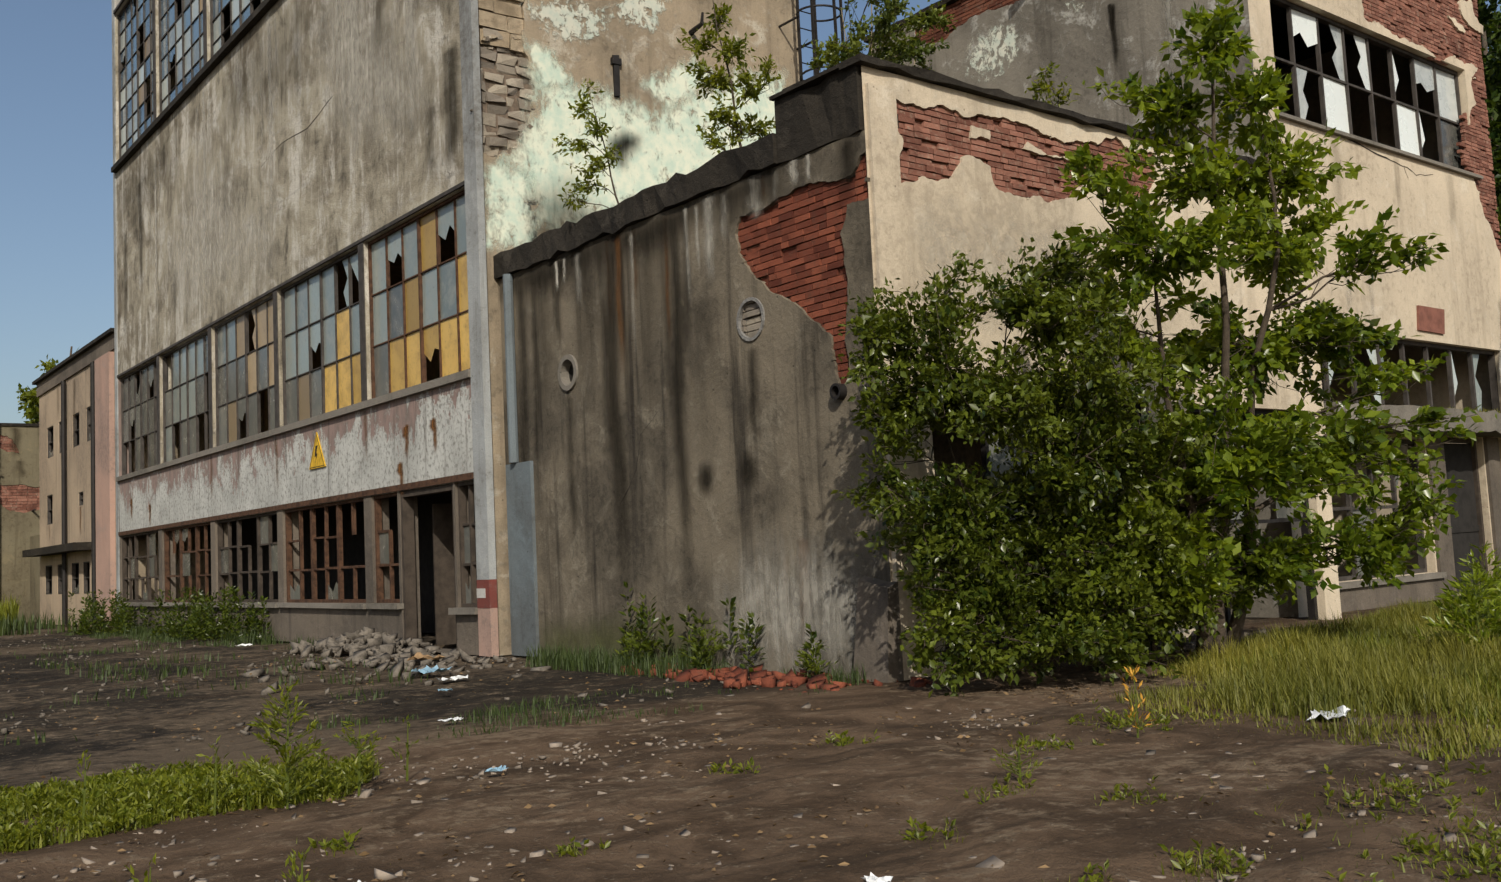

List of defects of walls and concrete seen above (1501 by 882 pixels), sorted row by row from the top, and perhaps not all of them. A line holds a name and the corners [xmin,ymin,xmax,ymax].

spalling [915,0,1021,81]
peeling [470,0,784,247]
damp [790,153,810,181]
spalling [896,103,1154,203]
spalling [1362,0,1501,255]
spalling [738,155,870,384]
damp [513,172,772,517]
spalling [0,483,40,513]
damp [740,564,853,649]